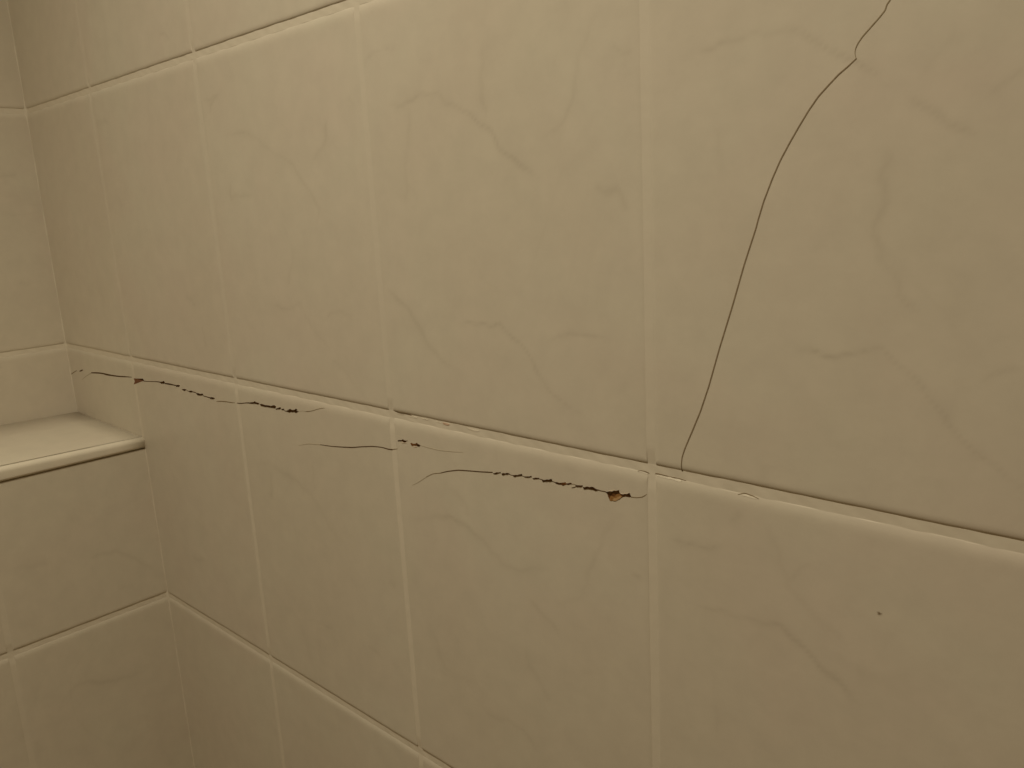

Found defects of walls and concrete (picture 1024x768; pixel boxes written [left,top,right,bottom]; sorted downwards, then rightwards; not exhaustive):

crack [413,0,890,501]
crack [71,370,322,413]
crack [298,443,395,451]